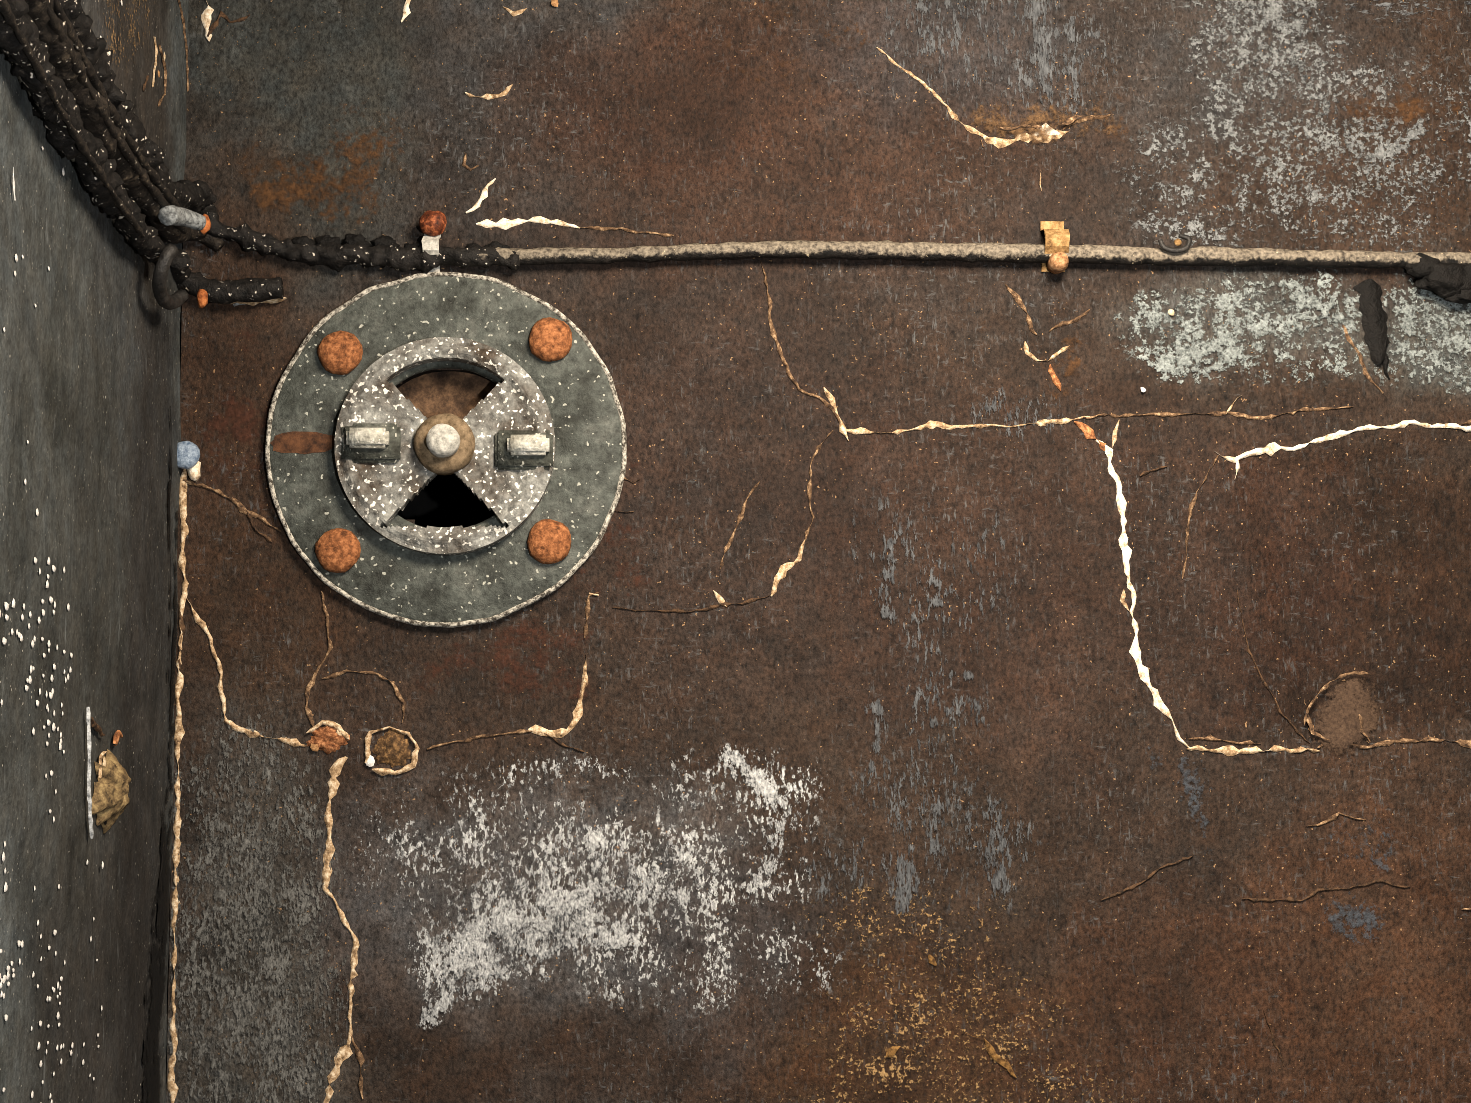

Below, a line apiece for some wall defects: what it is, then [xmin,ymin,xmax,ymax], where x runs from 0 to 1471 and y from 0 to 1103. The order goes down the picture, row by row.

crack [201,1,250,42]
crack [401,0,411,22]
peeling [885,0,1115,116]
crack [876,47,1111,191]
flaking render [1113,269,1471,395]
damp [1342,279,1390,394]
crack [427,260,1471,756]
crack [167,469,406,1103]
crack [1310,812,1366,827]
crack [1101,855,1193,901]
crack [1242,879,1410,903]
rust [777,887,1132,1103]